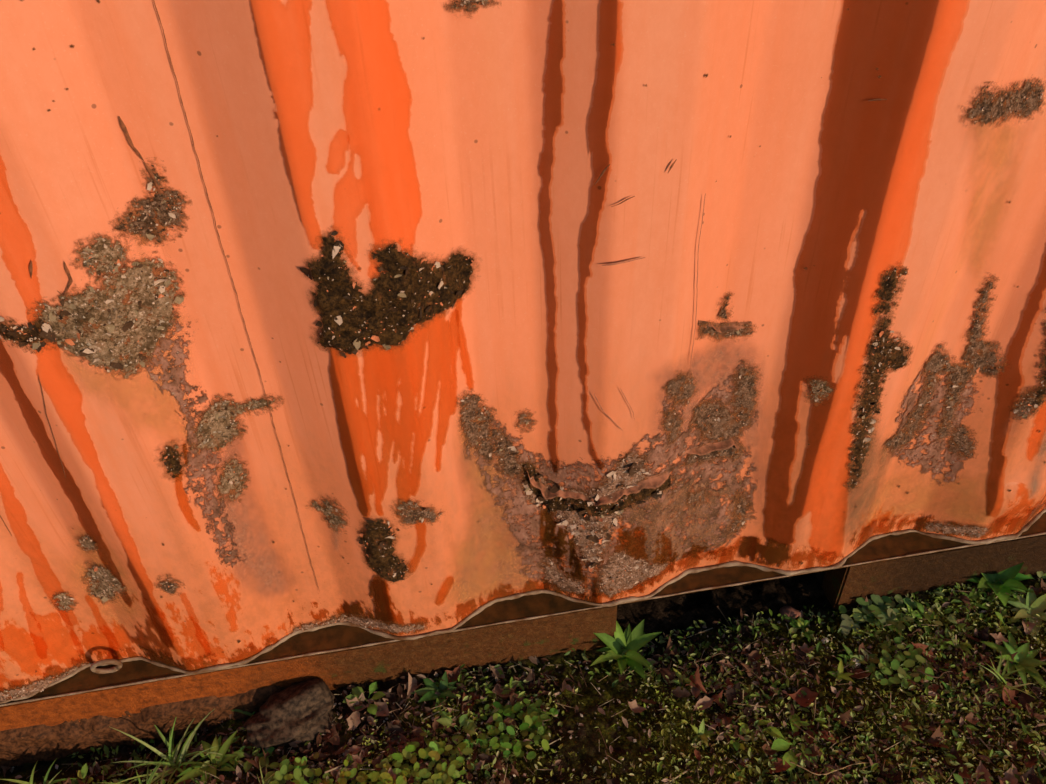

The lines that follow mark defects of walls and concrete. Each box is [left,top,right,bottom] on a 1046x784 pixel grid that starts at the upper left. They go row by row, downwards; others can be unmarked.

rust [962,79,1046,127]
peeling [0,317,64,354]
rust [847,263,1006,492]
peeling [145,311,246,568]
rust [160,394,284,502]
peeling [464,360,759,595]
peeling [892,369,981,484]
rust [311,497,347,531]
rust [392,500,442,536]
rust [77,535,126,604]
rust [157,575,186,595]
rust [0,662,91,701]